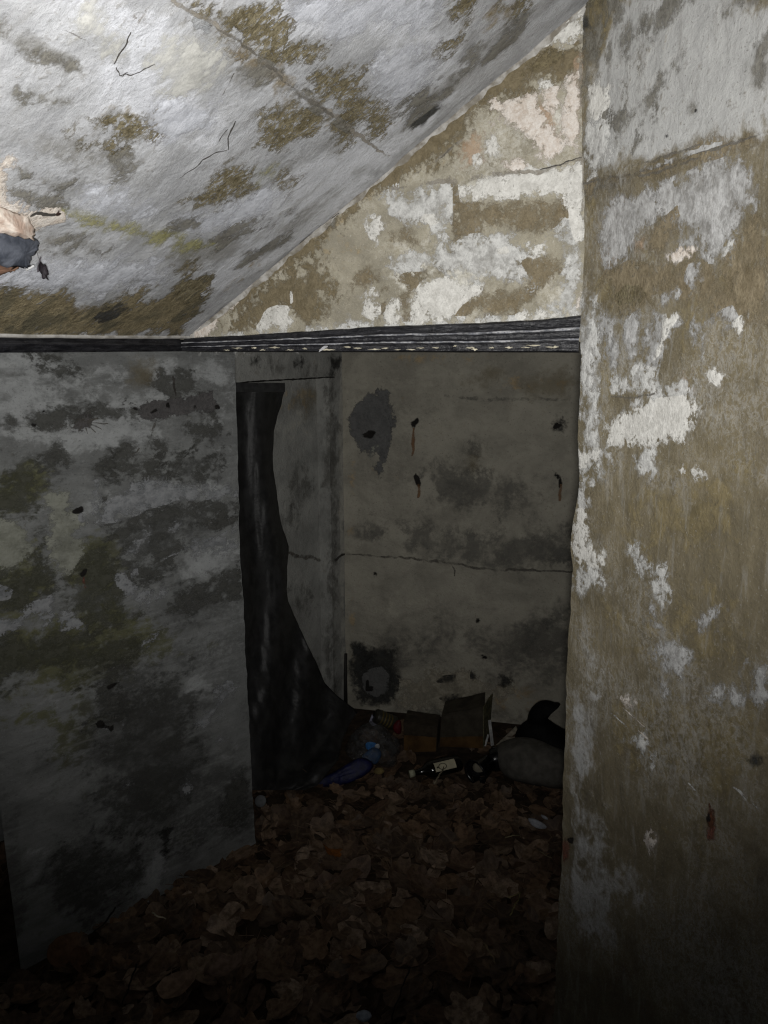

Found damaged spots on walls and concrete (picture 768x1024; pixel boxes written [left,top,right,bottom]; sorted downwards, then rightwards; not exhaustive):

crack [114,32,155,77]
crack [171,0,383,153]
crack [180,121,236,178]
peeling [0,156,169,301]
leakage [61,210,258,253]
peeling [175,183,282,235]
leakage [219,40,583,336]
peeling [256,291,294,333]
peeling [361,68,757,596]
leakage [95,410,230,484]
leakage [0,500,242,698]
crack [289,552,573,576]